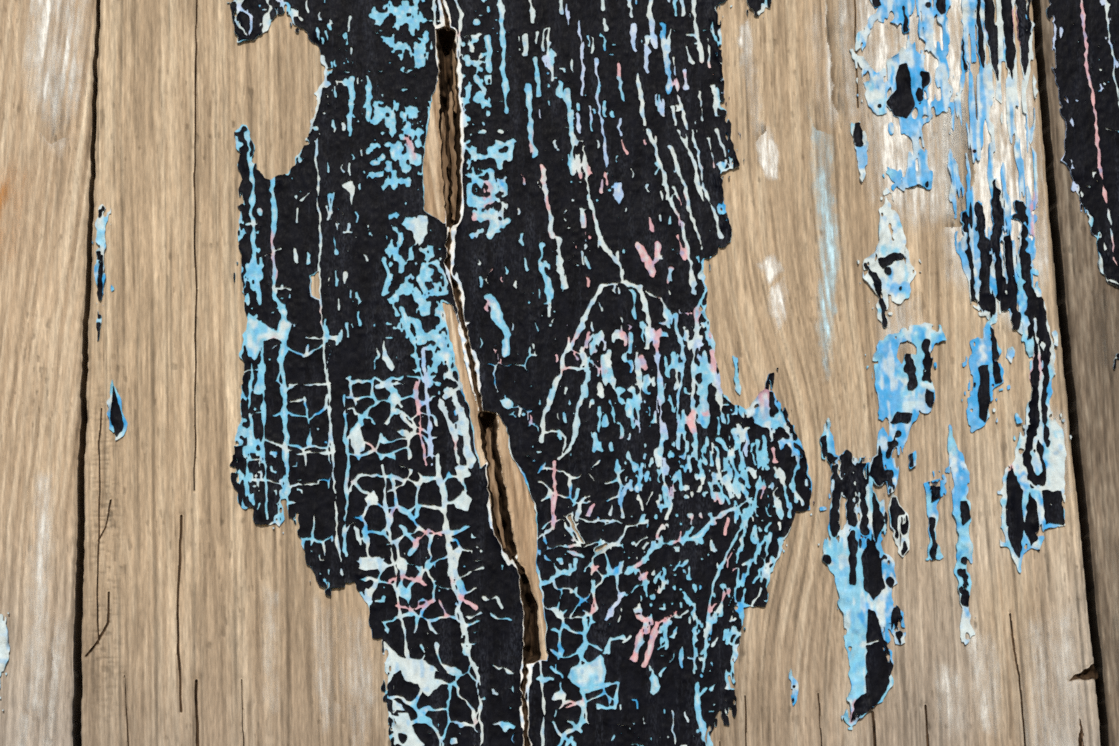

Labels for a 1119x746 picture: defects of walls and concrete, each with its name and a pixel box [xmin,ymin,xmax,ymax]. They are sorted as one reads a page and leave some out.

peeling [1046,0,1119,288]
peeling [92,204,114,341]
peeling [107,380,128,440]
crack [423,0,548,746]
peeling [227,0,1072,746]
peeling [0,612,10,711]
crack [1077,719,1085,746]
spalling [1069,663,1098,681]